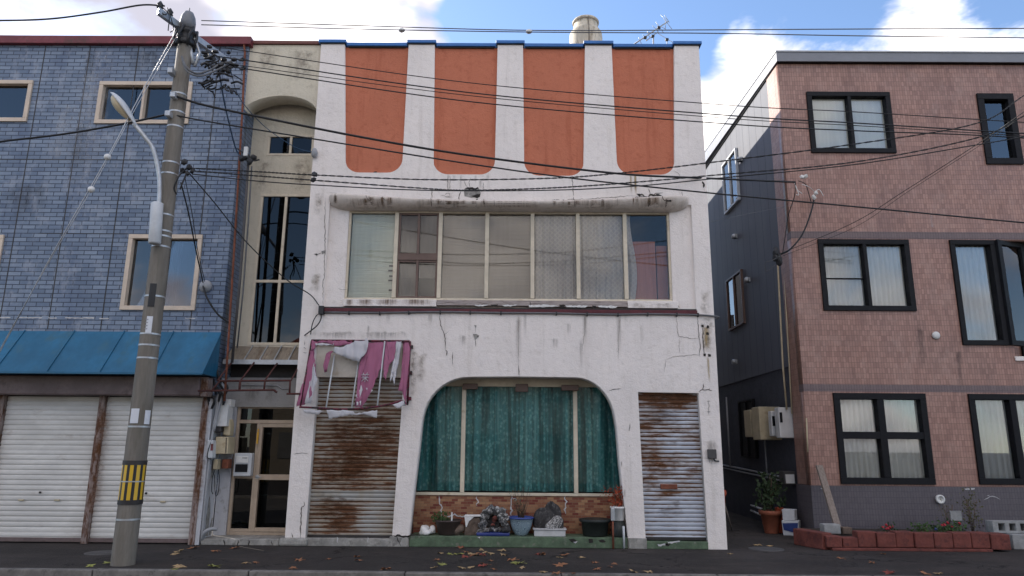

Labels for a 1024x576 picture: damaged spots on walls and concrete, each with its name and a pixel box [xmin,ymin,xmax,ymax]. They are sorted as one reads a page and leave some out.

crack [664,306,701,369]